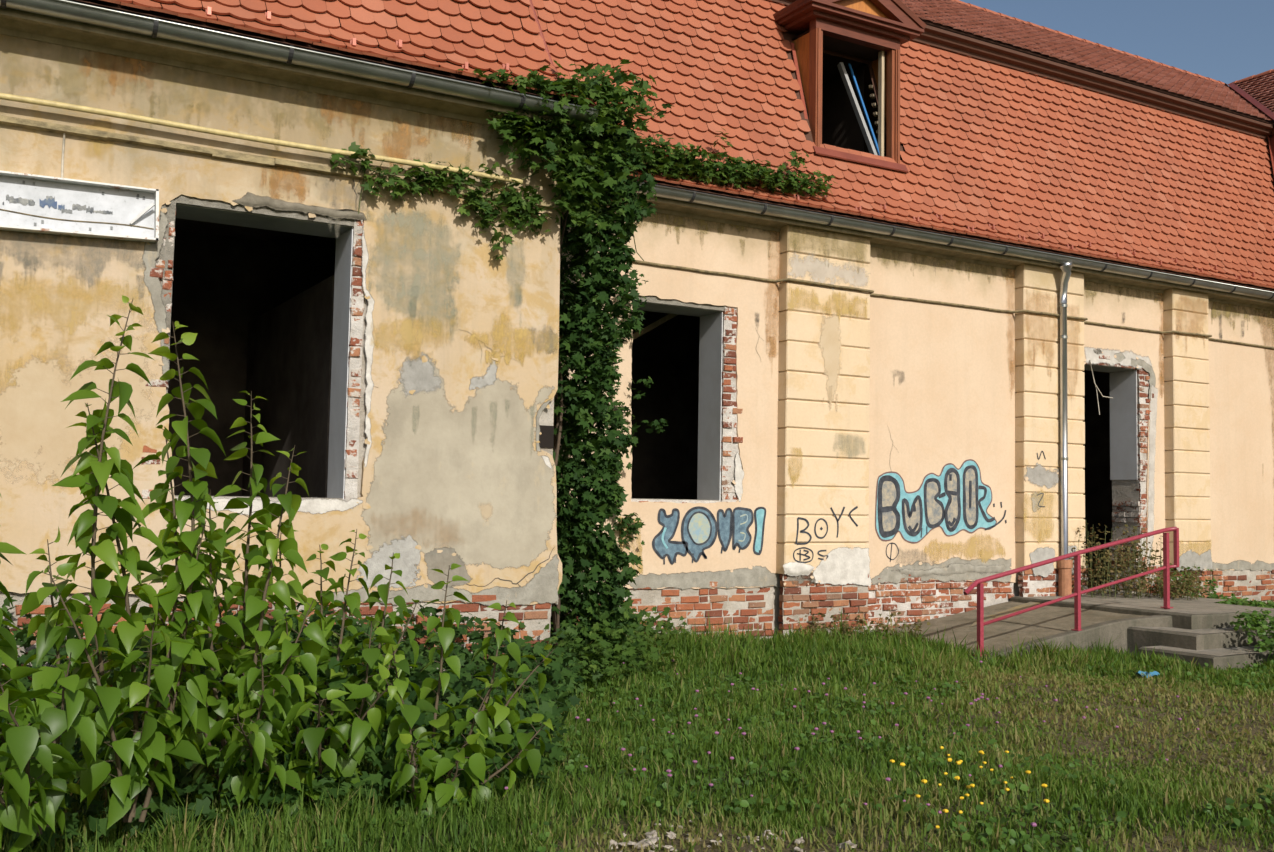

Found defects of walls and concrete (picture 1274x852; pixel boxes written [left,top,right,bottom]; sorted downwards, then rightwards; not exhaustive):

peeling [0,192,559,606]
flaking render [631,296,744,504]
spalling [628,547,1012,590]
spalling [1030,545,1077,577]
flaking render [1084,347,1158,589]